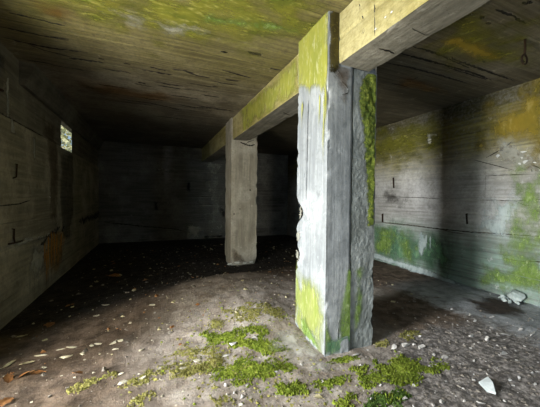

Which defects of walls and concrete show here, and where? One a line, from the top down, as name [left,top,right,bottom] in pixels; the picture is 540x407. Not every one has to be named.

water stain [480,204,517,234]
water stain [419,232,431,255]